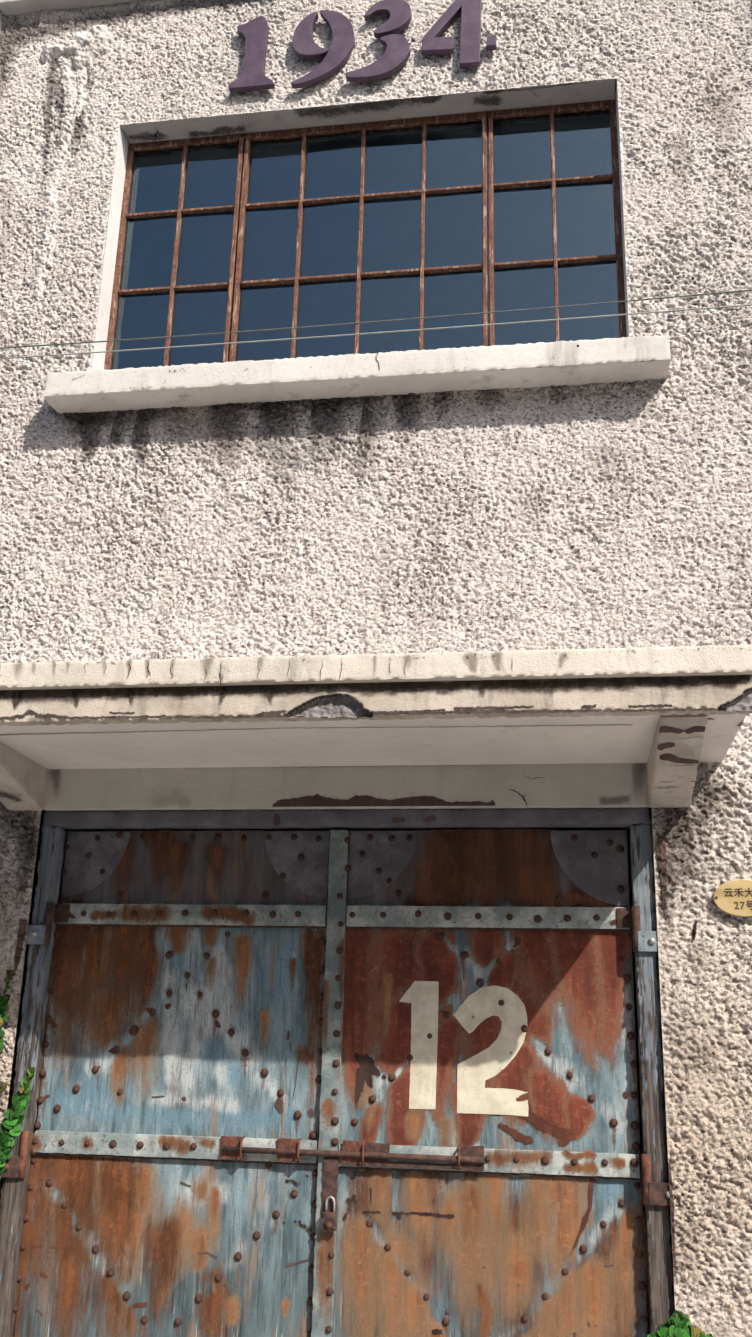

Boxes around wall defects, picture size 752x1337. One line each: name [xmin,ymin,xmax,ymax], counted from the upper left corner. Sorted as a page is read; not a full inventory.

damp [0,0,247,94]
damp [45,58,83,155]
damp [51,406,182,461]
damp [211,393,419,468]
flaking render [0,688,752,764]
peeling [272,794,495,825]
rust [45,896,188,1098]
rust [201,906,256,1006]
rust [274,829,648,1337]
rust [14,1134,239,1337]